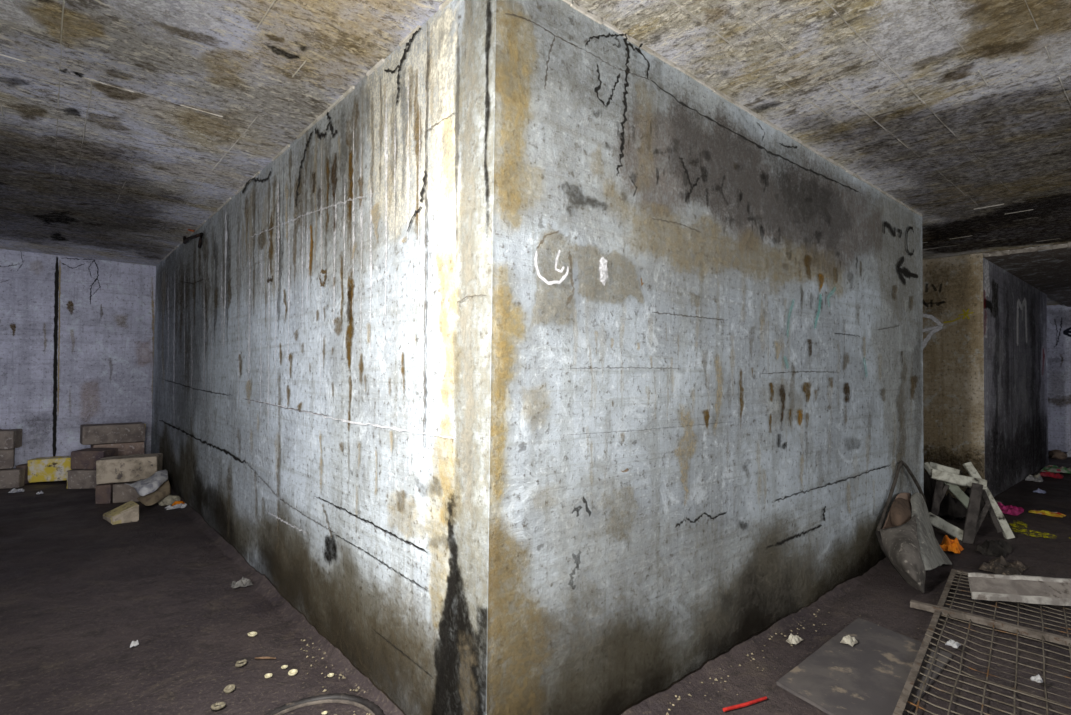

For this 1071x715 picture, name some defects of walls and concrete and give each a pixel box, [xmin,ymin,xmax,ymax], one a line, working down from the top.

rust [245,130,380,430]
crack [295,112,337,207]
crack [384,28,455,446]
crack [505,13,862,196]
crack [679,156,728,204]
water stain [843,89,1071,254]
rust [254,344,302,534]
rust [769,382,818,449]
rust [829,378,850,423]
water stain [322,504,336,561]
water stain [428,495,487,715]
water stain [529,523,886,715]